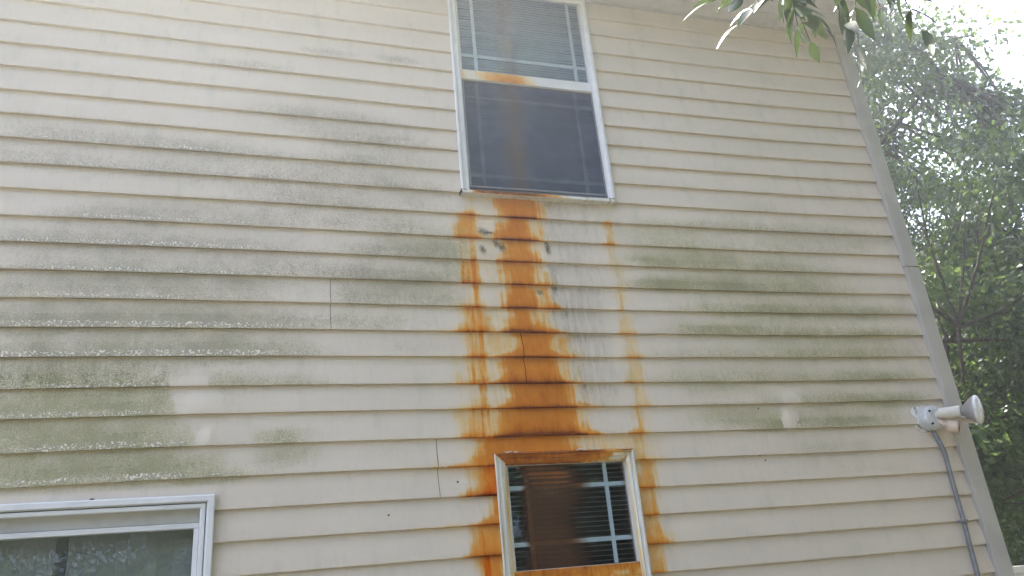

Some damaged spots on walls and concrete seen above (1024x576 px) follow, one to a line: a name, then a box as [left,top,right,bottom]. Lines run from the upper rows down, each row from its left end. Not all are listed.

corrosion [490,374,578,409]
corrosion [492,421,588,438]
corrosion [478,449,640,576]